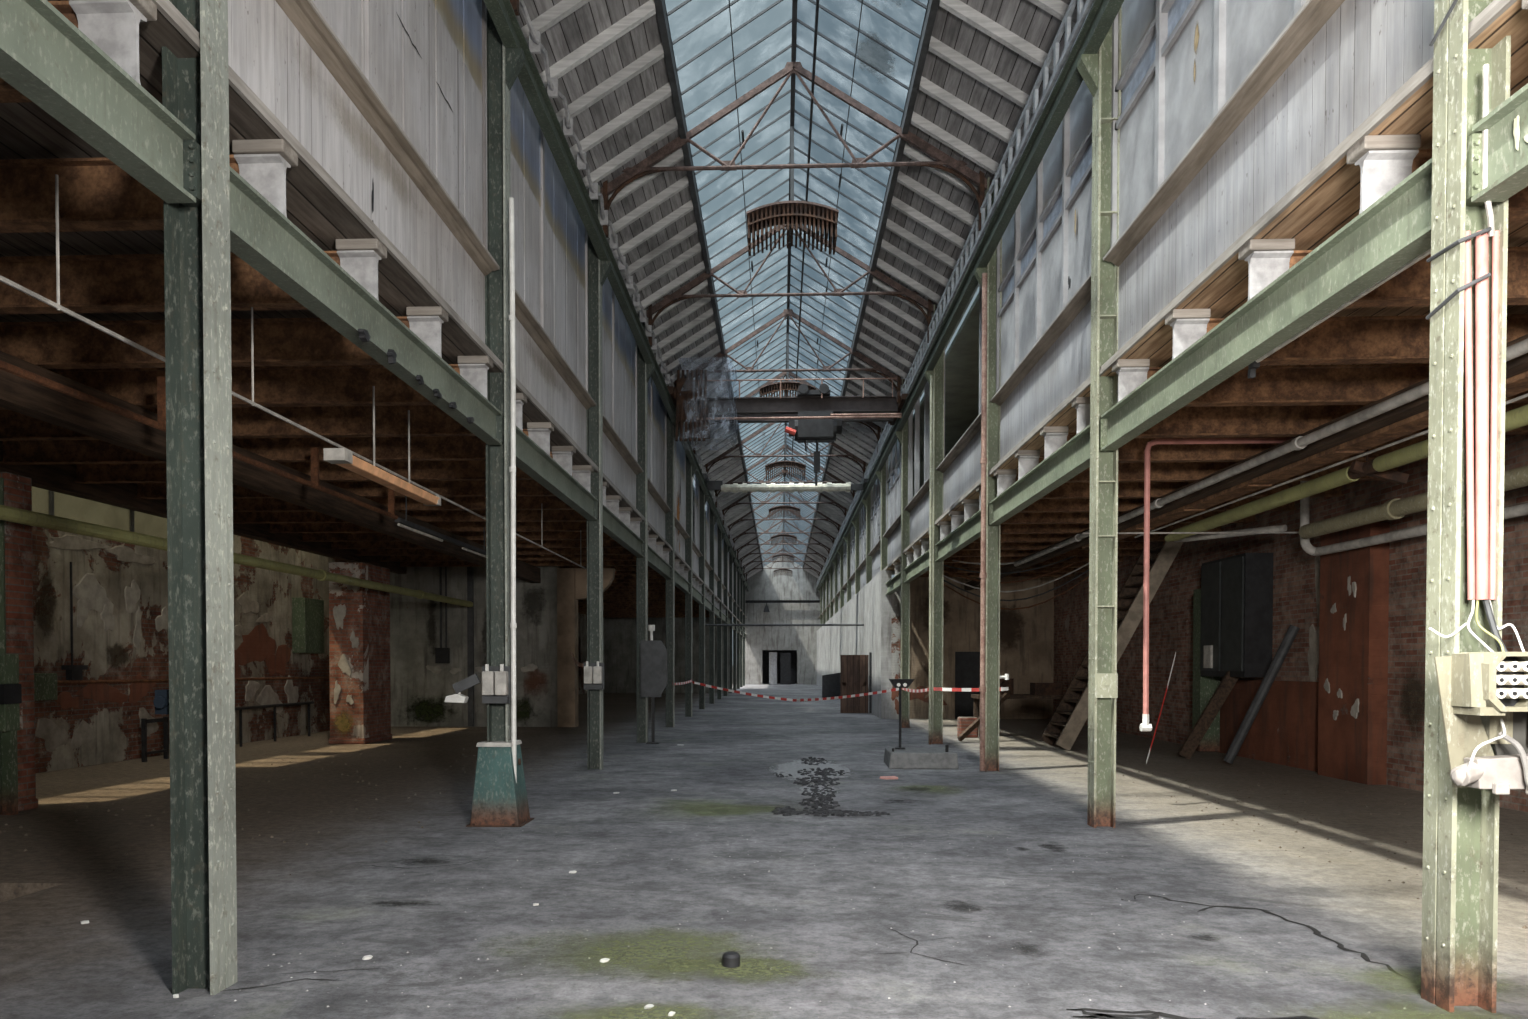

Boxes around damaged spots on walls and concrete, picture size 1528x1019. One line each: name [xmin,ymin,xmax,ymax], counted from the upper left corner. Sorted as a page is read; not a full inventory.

peeling [49,535,168,649]
flaking render [234,593,299,714]
peeling [333,573,359,705]
peeling [139,707,159,737]
crack [1121,894,1411,980]